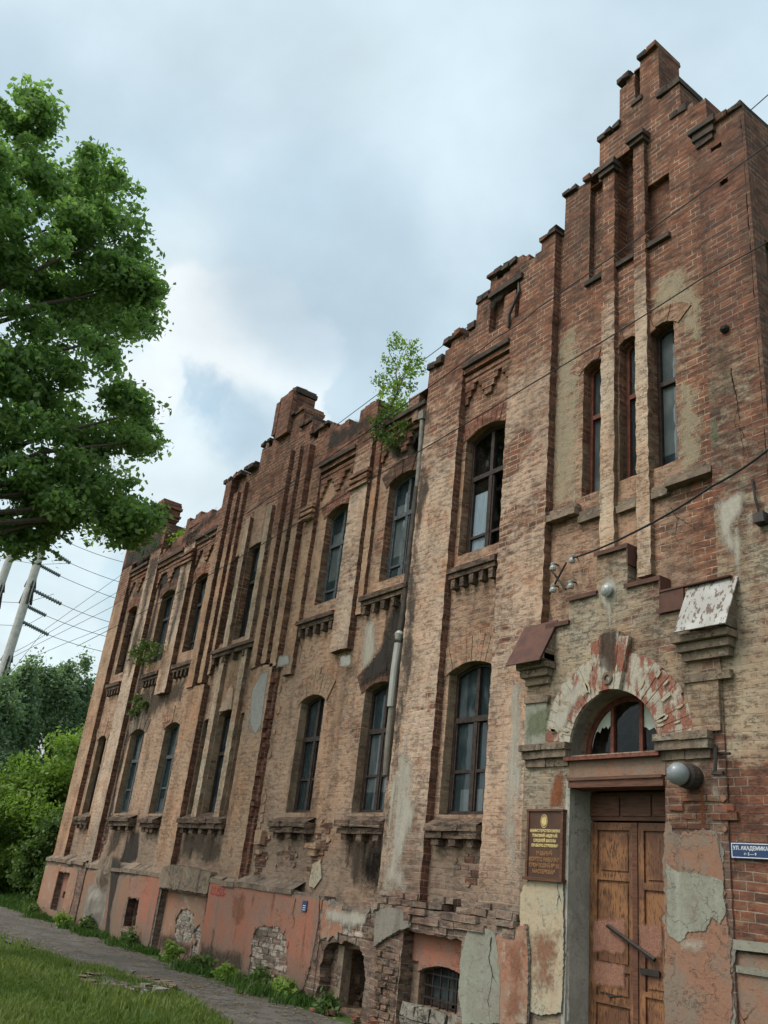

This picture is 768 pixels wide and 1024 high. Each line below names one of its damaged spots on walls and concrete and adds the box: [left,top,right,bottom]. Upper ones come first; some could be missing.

damp [718,493,751,564]
damp [346,468,428,887]
peeling [549,654,600,735]
peeling [639,671,684,727]
spalling [173,908,201,956]
spalling [248,925,290,985]